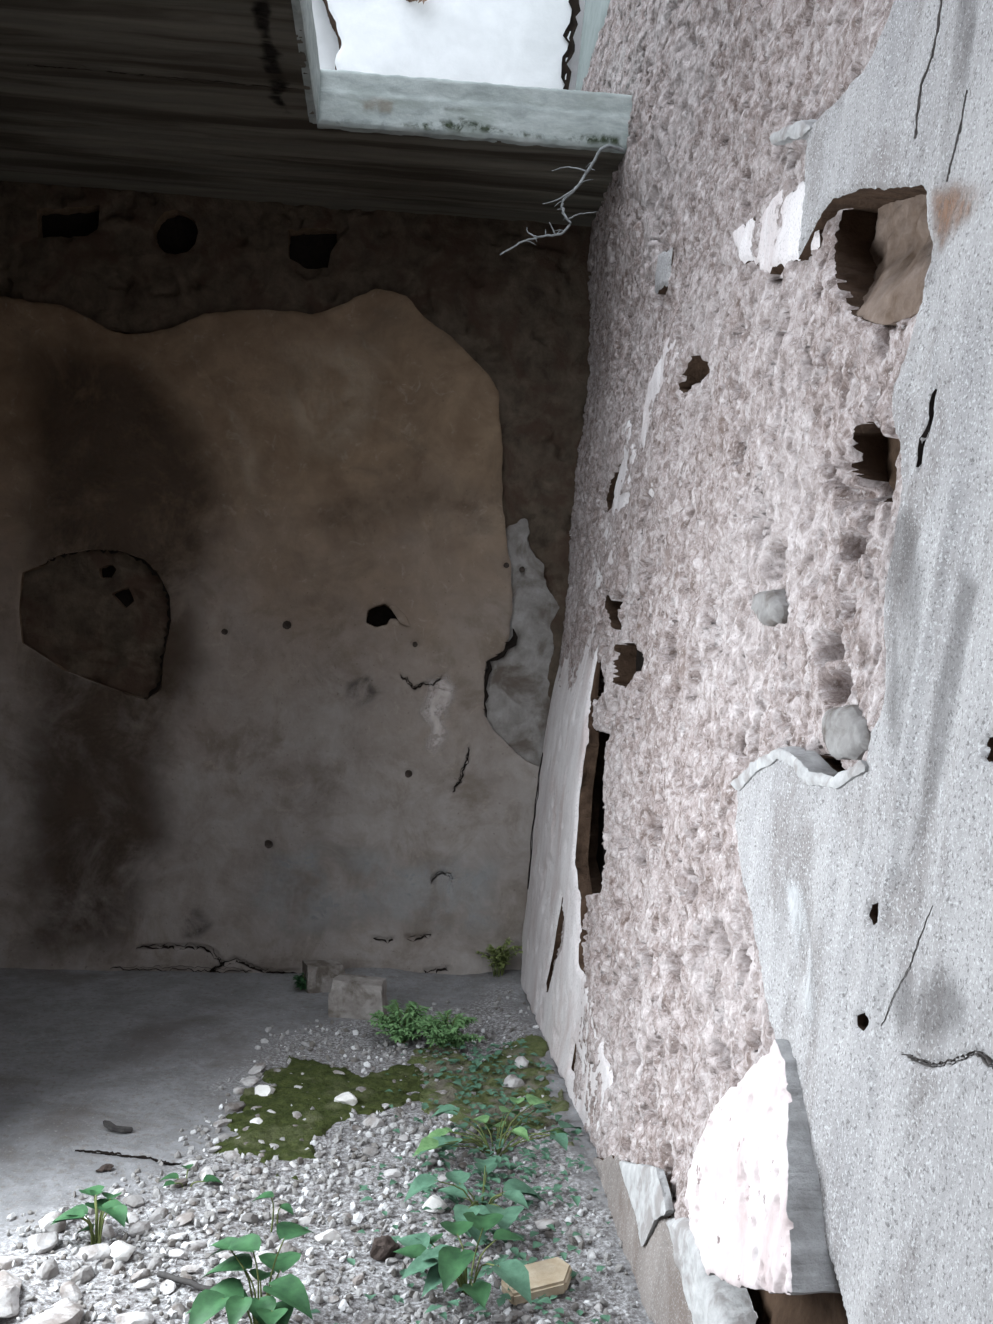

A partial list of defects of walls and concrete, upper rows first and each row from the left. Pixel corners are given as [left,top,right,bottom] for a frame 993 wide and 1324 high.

damp [253,2,287,106]
crack [914,0,942,139]
crack [946,90,968,182]
spalling [855,194,933,326]
spalling [0,181,592,767]
crack [916,389,937,467]
spalling [559,0,917,1220]
flaking render [521,626,614,1127]
crack [110,943,295,974]
crack [881,905,933,1026]
crack [901,1050,993,1070]
flaking render [619,1160,674,1246]